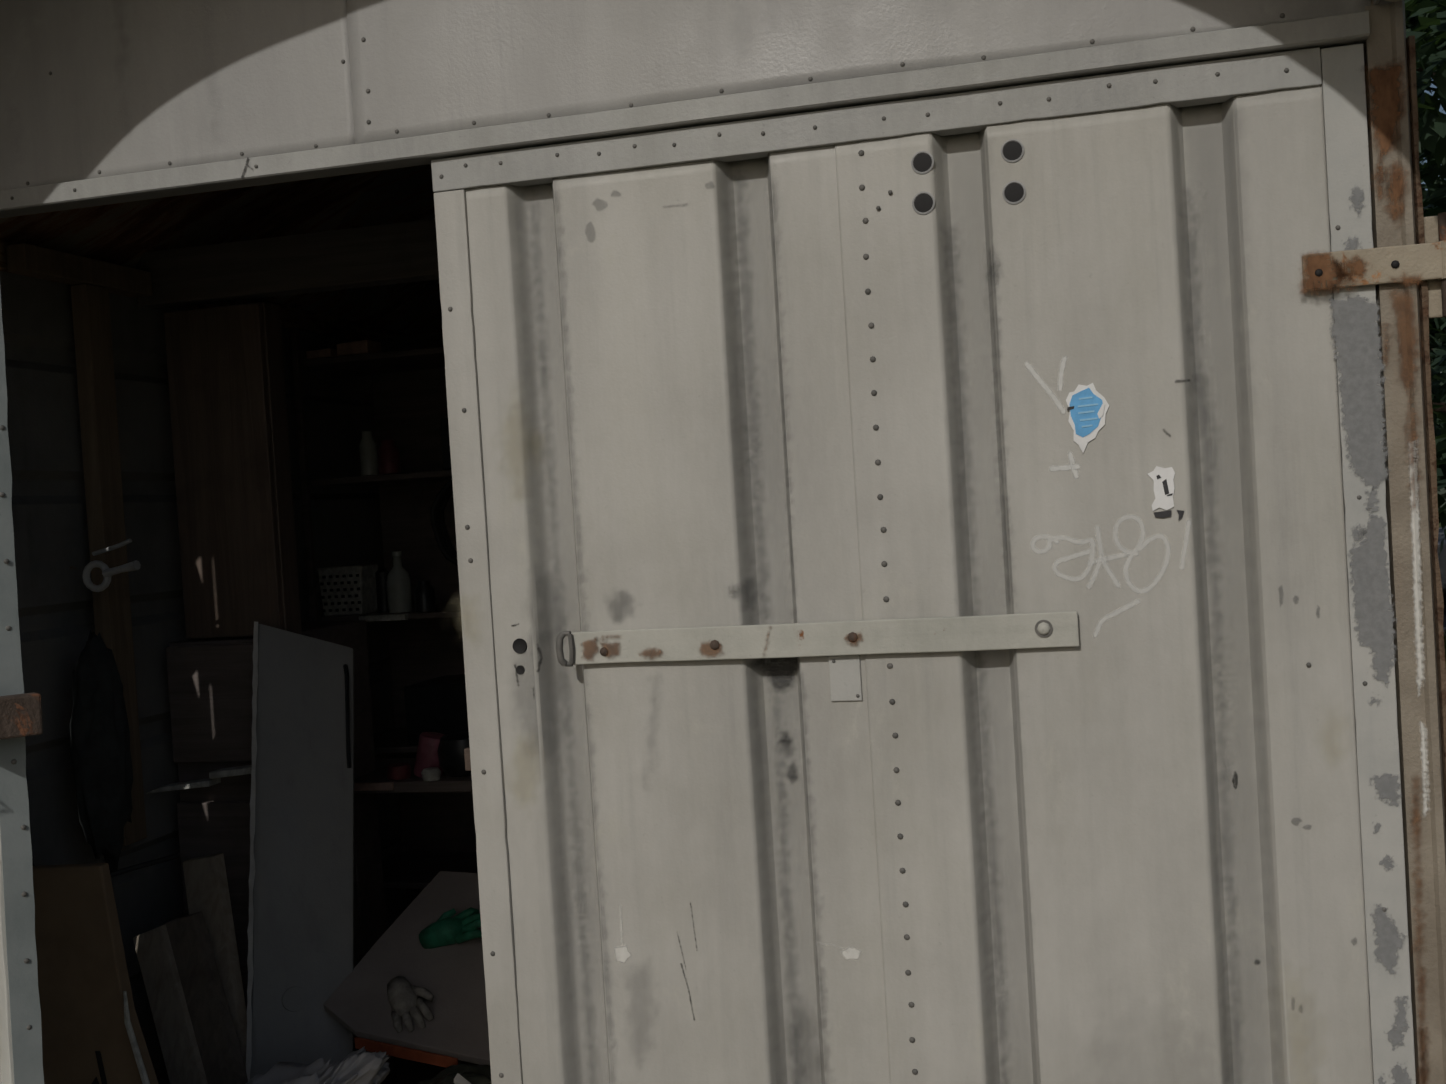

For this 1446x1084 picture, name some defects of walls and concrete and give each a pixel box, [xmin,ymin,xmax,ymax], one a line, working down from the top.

rust [1368,64,1405,219]
peeling [1349,187,1364,214]
rust [1301,253,1366,293]
peeling [1329,295,1396,684]
peeling [1409,440,1424,695]
rust [583,639,619,659]
peeling [1371,774,1401,806]
peeling [1421,723,1429,815]
peeling [1380,855,1394,870]
peeling [1372,905,1405,974]
peeling [1378,996,1411,1084]